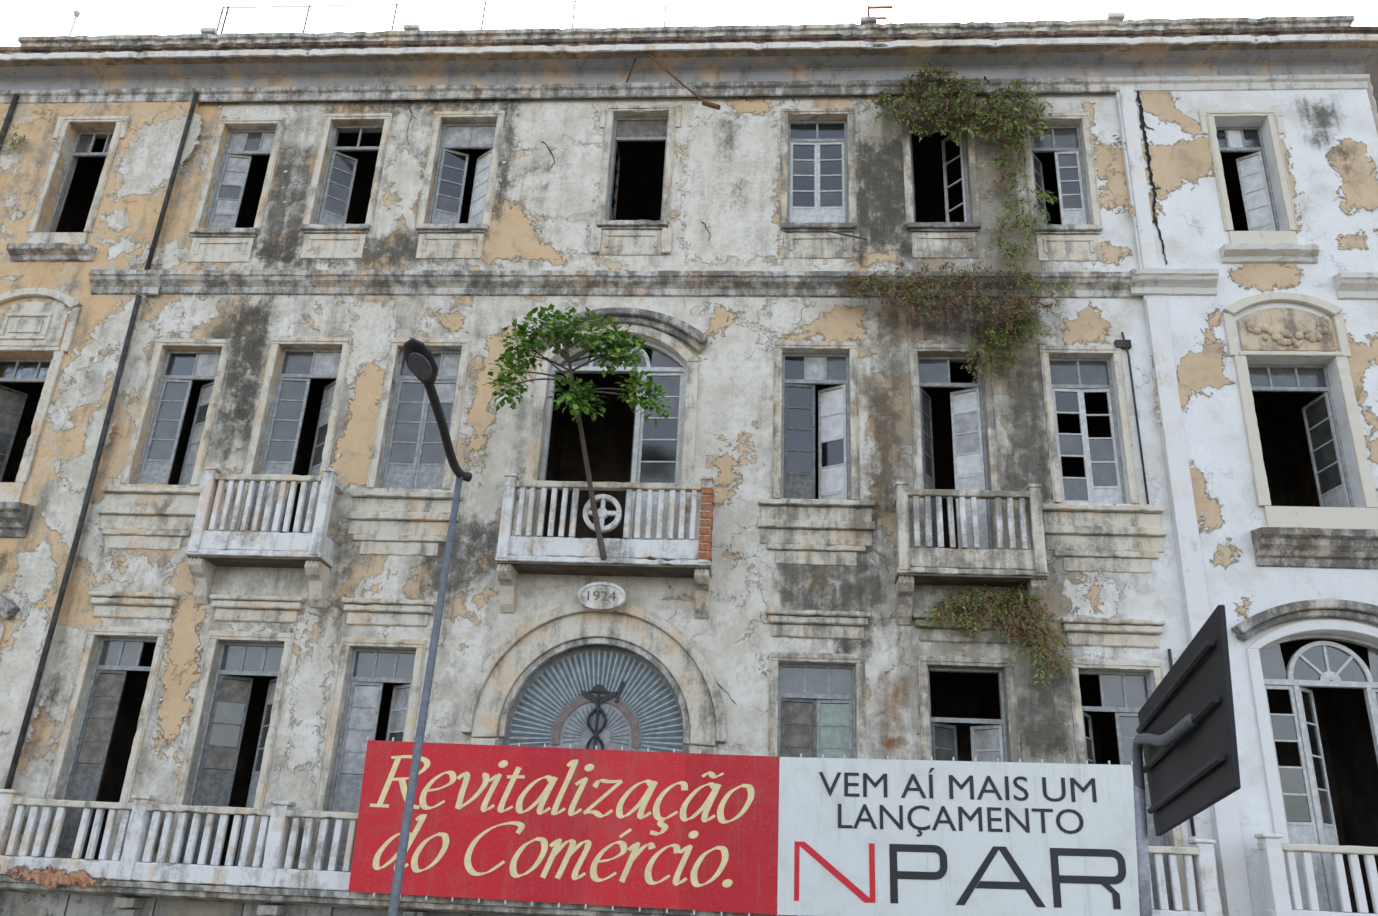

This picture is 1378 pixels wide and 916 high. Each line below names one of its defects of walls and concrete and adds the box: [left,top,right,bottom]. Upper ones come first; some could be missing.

peeling [458,98,604,267]
flaking render [1082,91,1215,227]
leakage [1304,100,1337,144]
flaking render [1325,138,1378,252]
flaking render [328,295,401,490]
flaking render [704,300,741,344]
flaking render [755,297,870,345]
flaking render [1151,355,1162,426]
flaking render [1176,308,1235,413]
flaking render [1327,313,1378,464]
flaking render [153,592,211,746]
spalling [0,865,110,890]